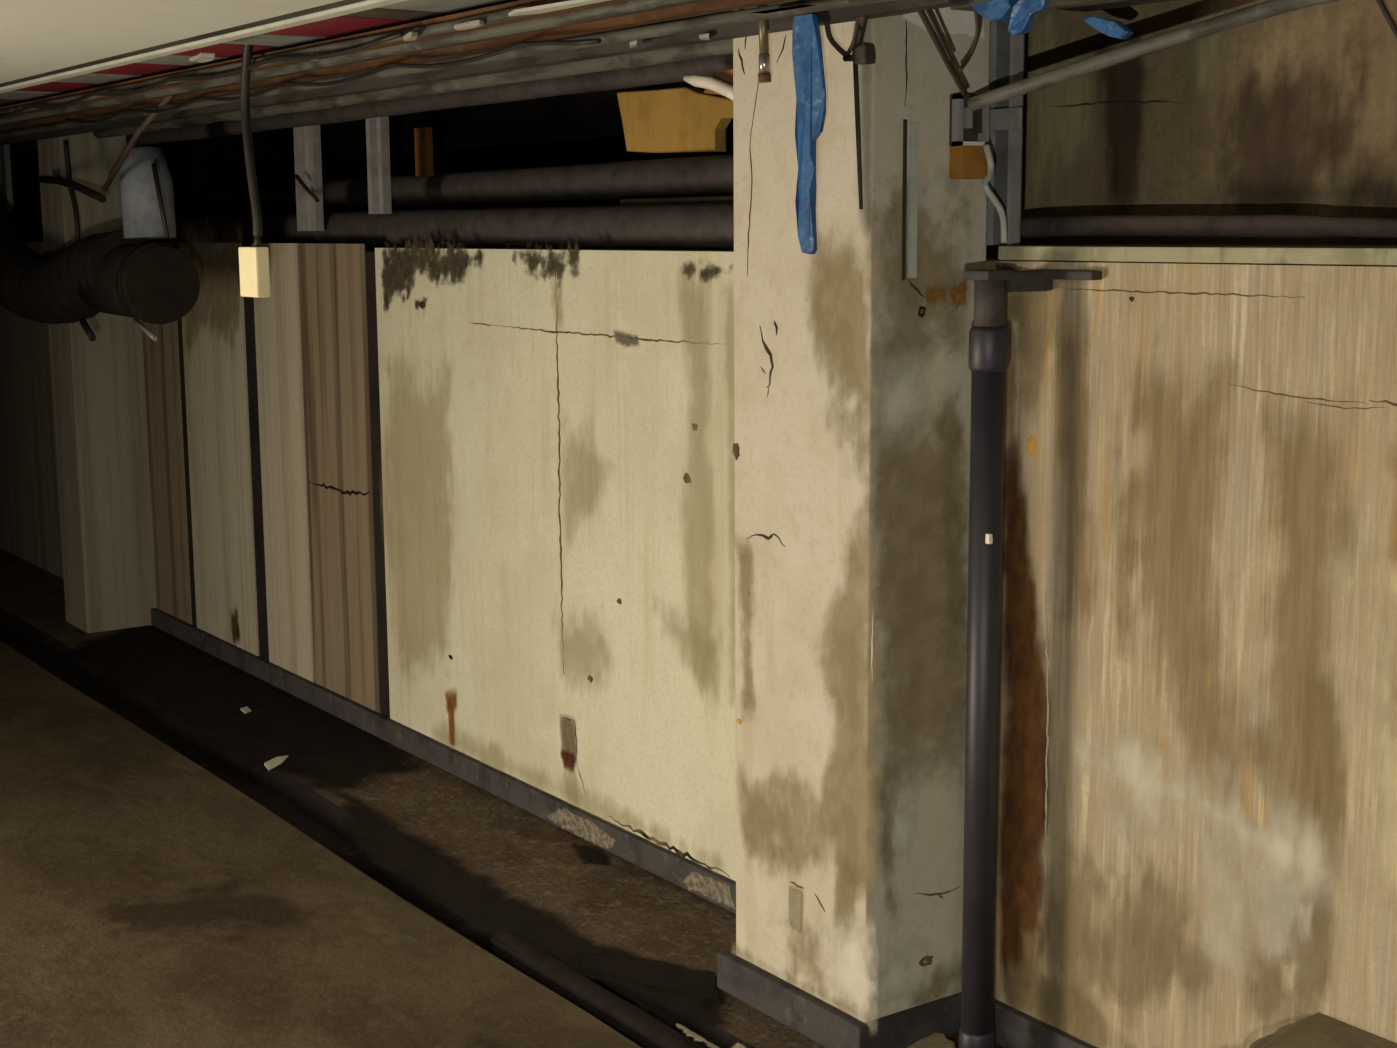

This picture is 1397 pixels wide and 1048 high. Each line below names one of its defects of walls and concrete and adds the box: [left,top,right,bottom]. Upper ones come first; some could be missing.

water stain [1228,78,1352,214]
water stain [381,235,481,311]
water stain [512,243,579,286]
water stain [682,263,731,282]
crack [759,321,778,397]
water stain [1013,291,1046,400]
crack [1229,383,1397,409]
water stain [1064,341,1092,613]
water stain [740,203,967,1021]
corrosion [445,693,455,745]
corrosion [1000,448,1049,992]
water stain [1008,385,1334,1047]